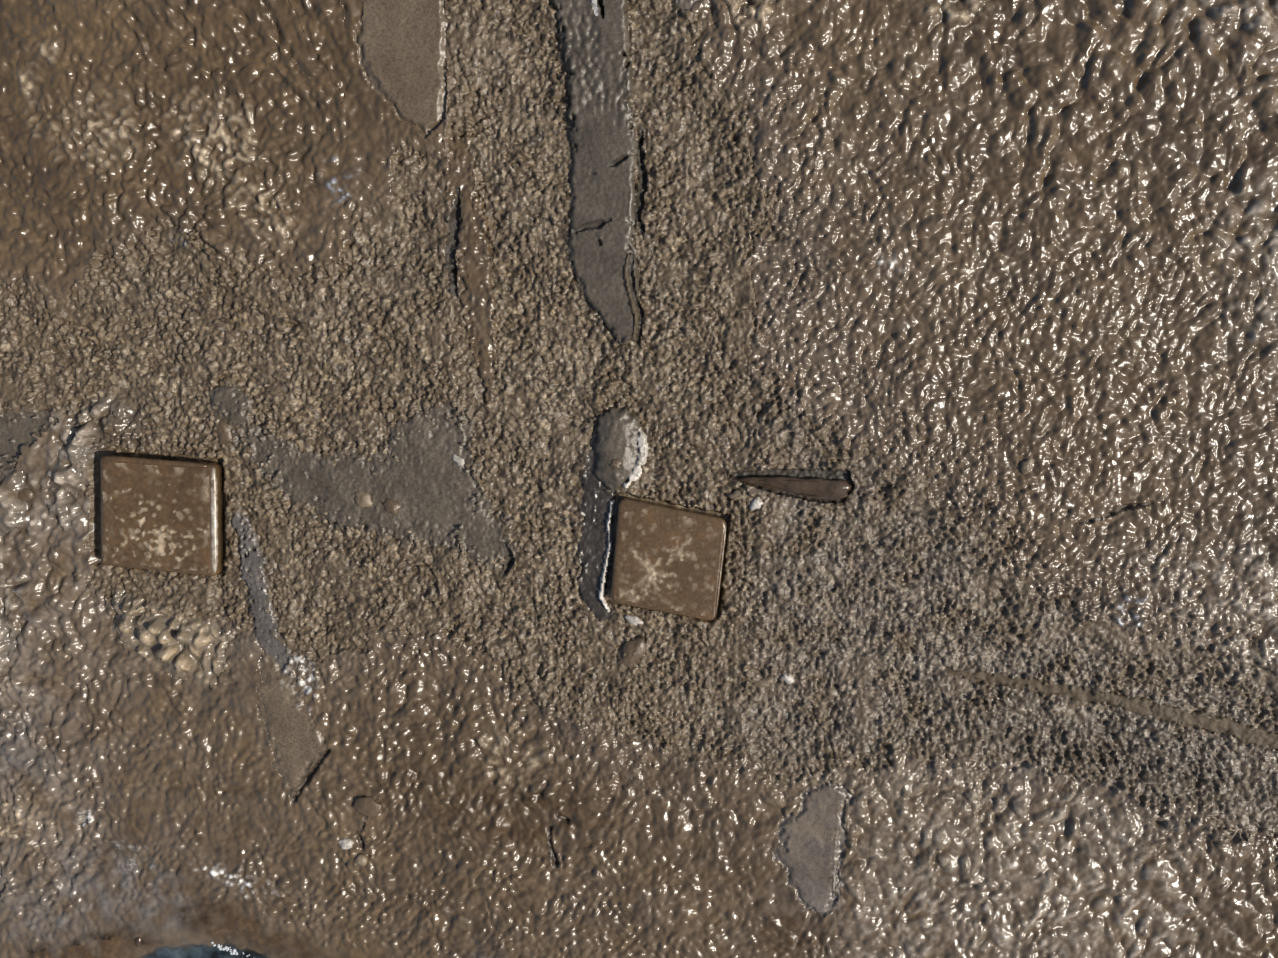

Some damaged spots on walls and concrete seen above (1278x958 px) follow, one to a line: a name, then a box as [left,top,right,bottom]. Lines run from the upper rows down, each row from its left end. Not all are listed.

crack [591,0,605,19]
crack [572,126,649,341]
spalling [0,0,781,761]
spalling [716,391,1278,843]
peeling [773,780,854,917]